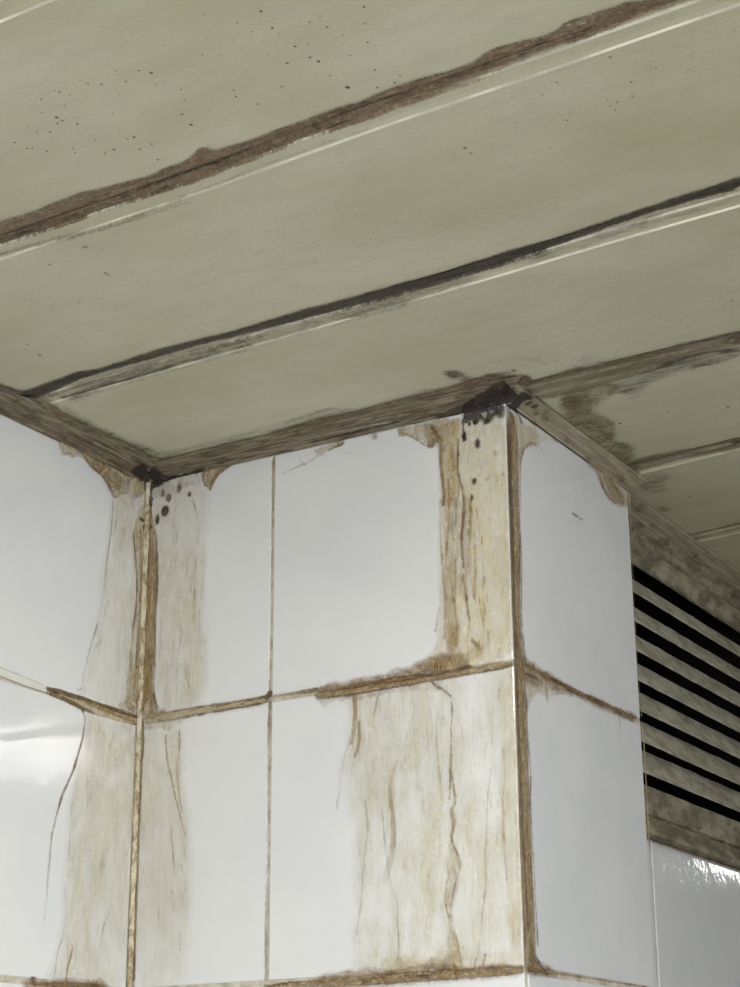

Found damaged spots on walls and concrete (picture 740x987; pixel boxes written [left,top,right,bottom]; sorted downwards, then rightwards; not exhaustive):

leakage [19,178,740,399]
leakage [120,464,205,529]
leakage [47,687,144,981]
leakage [351,695,361,752]
leakage [439,370,539,973]